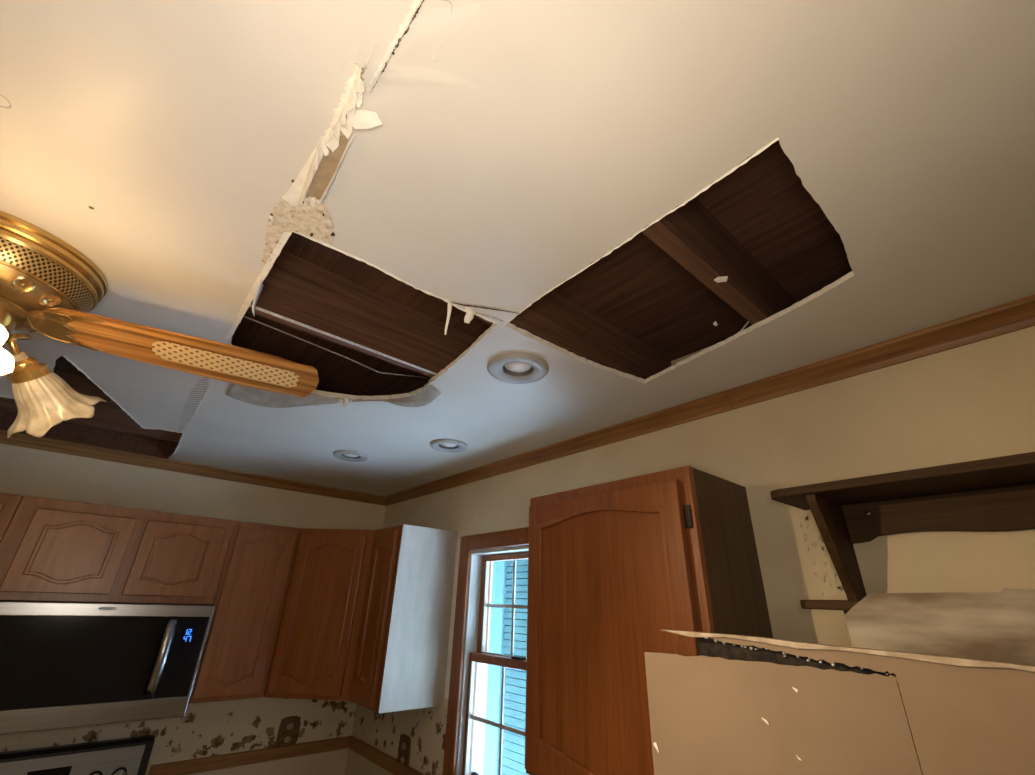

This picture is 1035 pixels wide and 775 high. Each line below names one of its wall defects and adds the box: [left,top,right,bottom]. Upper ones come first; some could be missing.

crack [367,0,452,93]
peeling [320,72,364,156]
spalling [261,197,335,264]